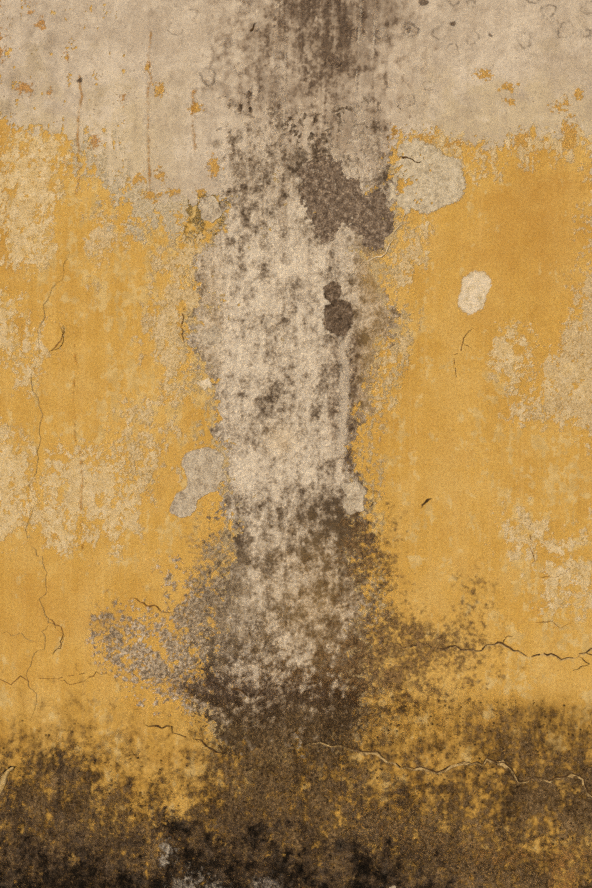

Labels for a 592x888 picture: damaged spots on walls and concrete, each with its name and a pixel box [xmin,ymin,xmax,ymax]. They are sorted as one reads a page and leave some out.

leakage [276,0,397,128]
flaking render [322,281,353,337]
peeling [385,219,435,296]
peeling [458,270,492,315]
leakage [338,338,357,463]
crack [0,259,113,717]
peeling [169,447,227,518]
peeling [341,481,369,514]
crack [377,636,592,670]
crack [146,725,228,755]
leakage [0,677,592,888]
crack [286,741,592,797]